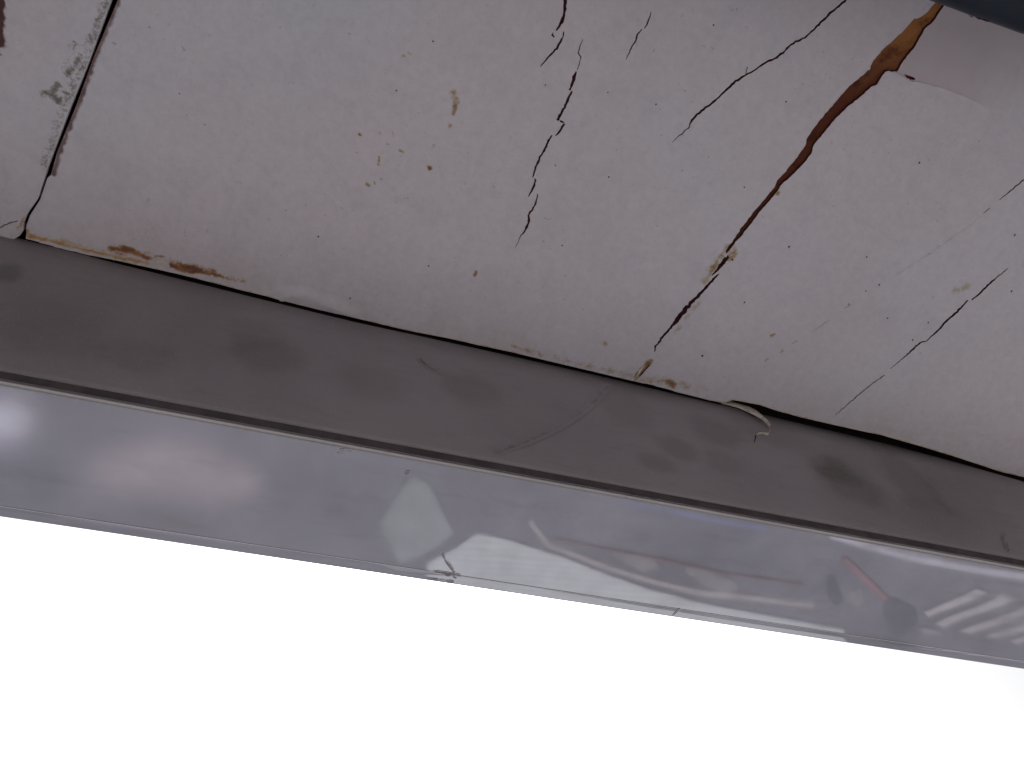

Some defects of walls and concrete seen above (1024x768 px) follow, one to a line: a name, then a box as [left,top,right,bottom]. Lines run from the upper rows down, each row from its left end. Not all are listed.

crack [626,13,651,59]
corrosion [0,214,253,286]
crack [515,0,583,248]
crack [635,0,944,379]
crack [837,268,1008,414]
peeling [721,401,771,443]